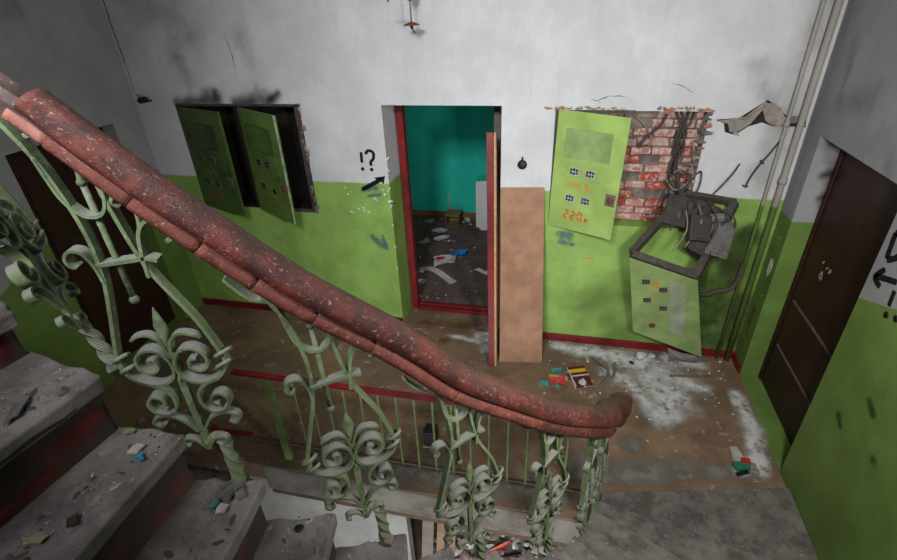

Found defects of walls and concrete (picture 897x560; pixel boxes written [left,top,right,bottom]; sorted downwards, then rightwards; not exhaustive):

flaking render [544,100,806,221]